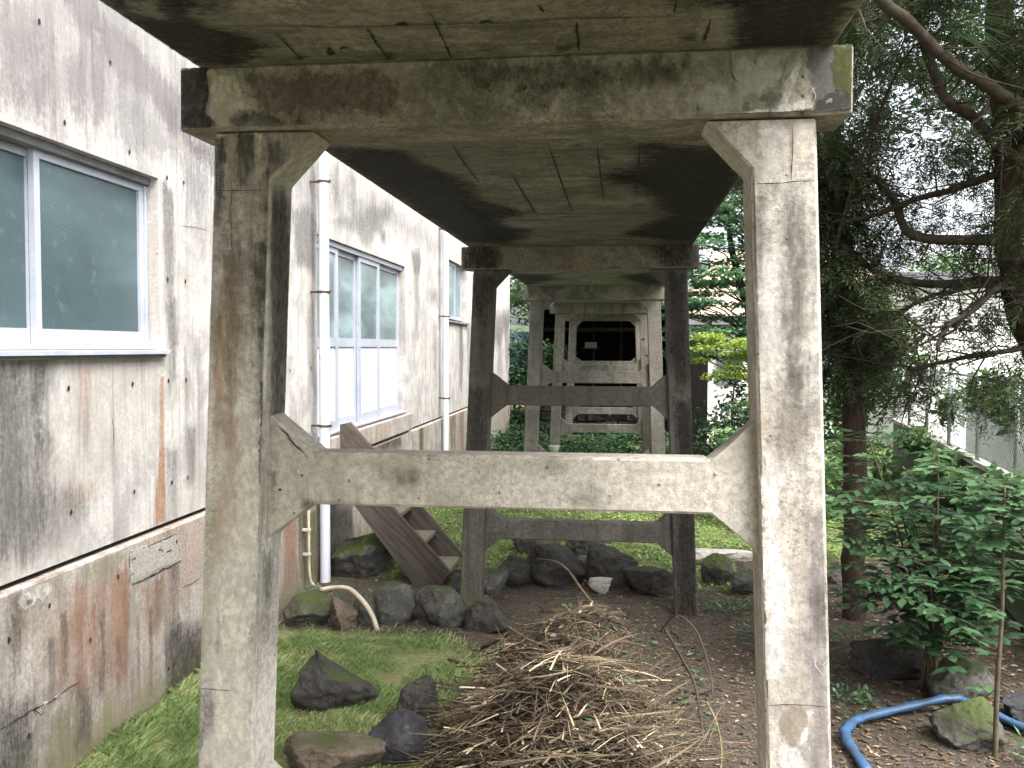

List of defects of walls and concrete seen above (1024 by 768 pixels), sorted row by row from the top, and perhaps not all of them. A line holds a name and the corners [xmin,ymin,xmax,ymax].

crack [240,1,677,58]
crack [703,19,711,43]
crack [485,143,641,217]
damp [327,147,532,312]
damp [592,143,738,382]
damp [459,324,488,451]
damp [676,402,692,455]
rust [156,455,165,524]
damp [164,172,316,768]
spalling [128,534,181,584]
damp [674,513,696,616]
crack [0,681,81,730]